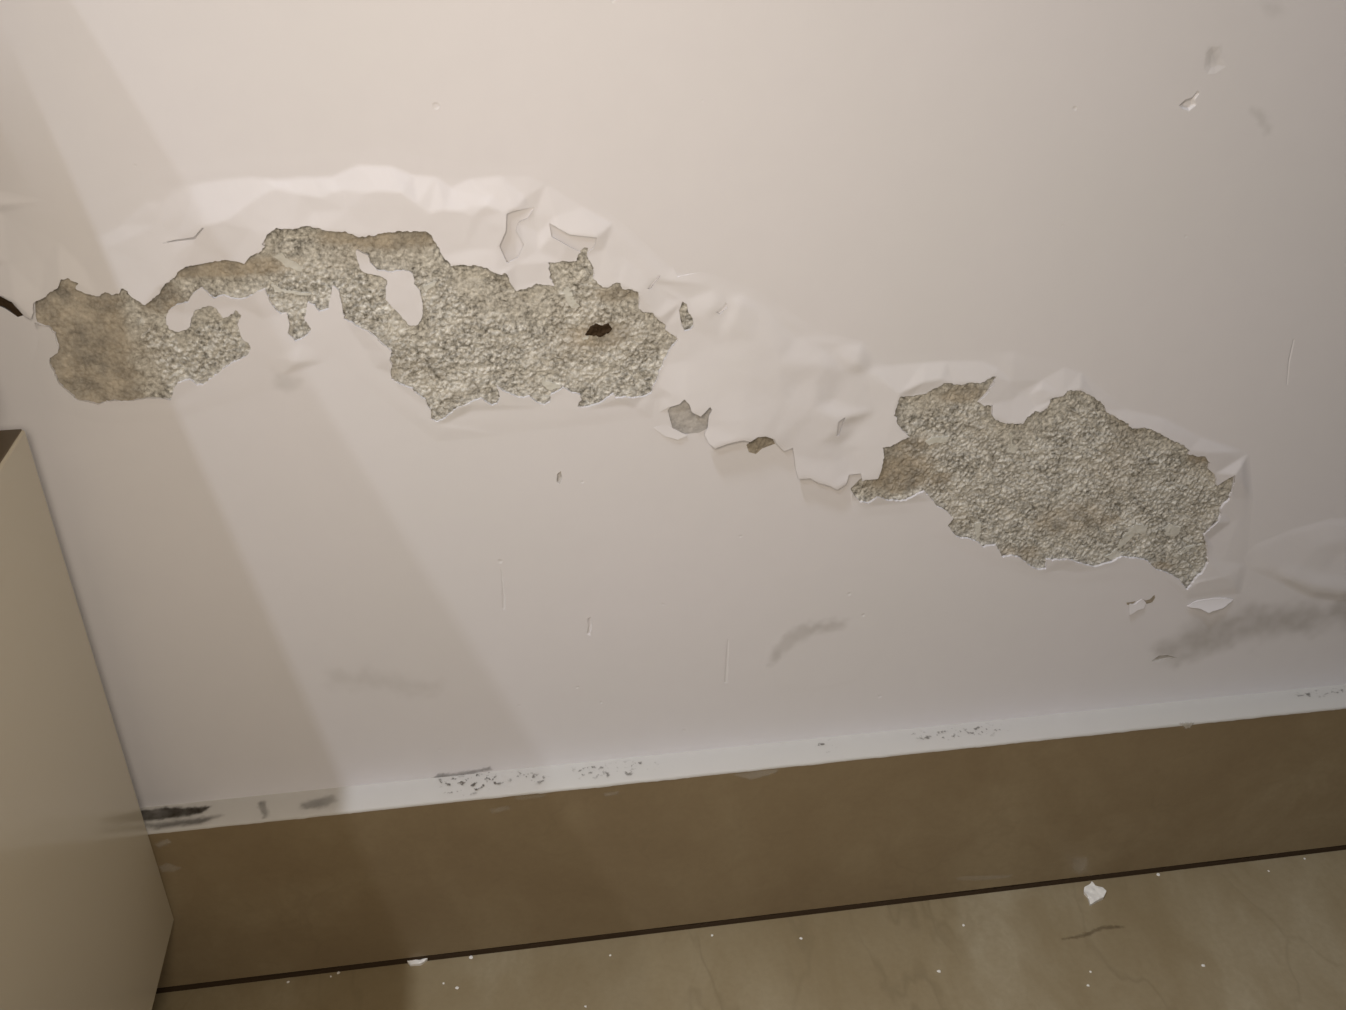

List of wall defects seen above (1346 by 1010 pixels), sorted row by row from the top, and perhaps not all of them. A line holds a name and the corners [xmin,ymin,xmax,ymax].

peeling [0,148,693,442]
peeling [851,350,1253,615]